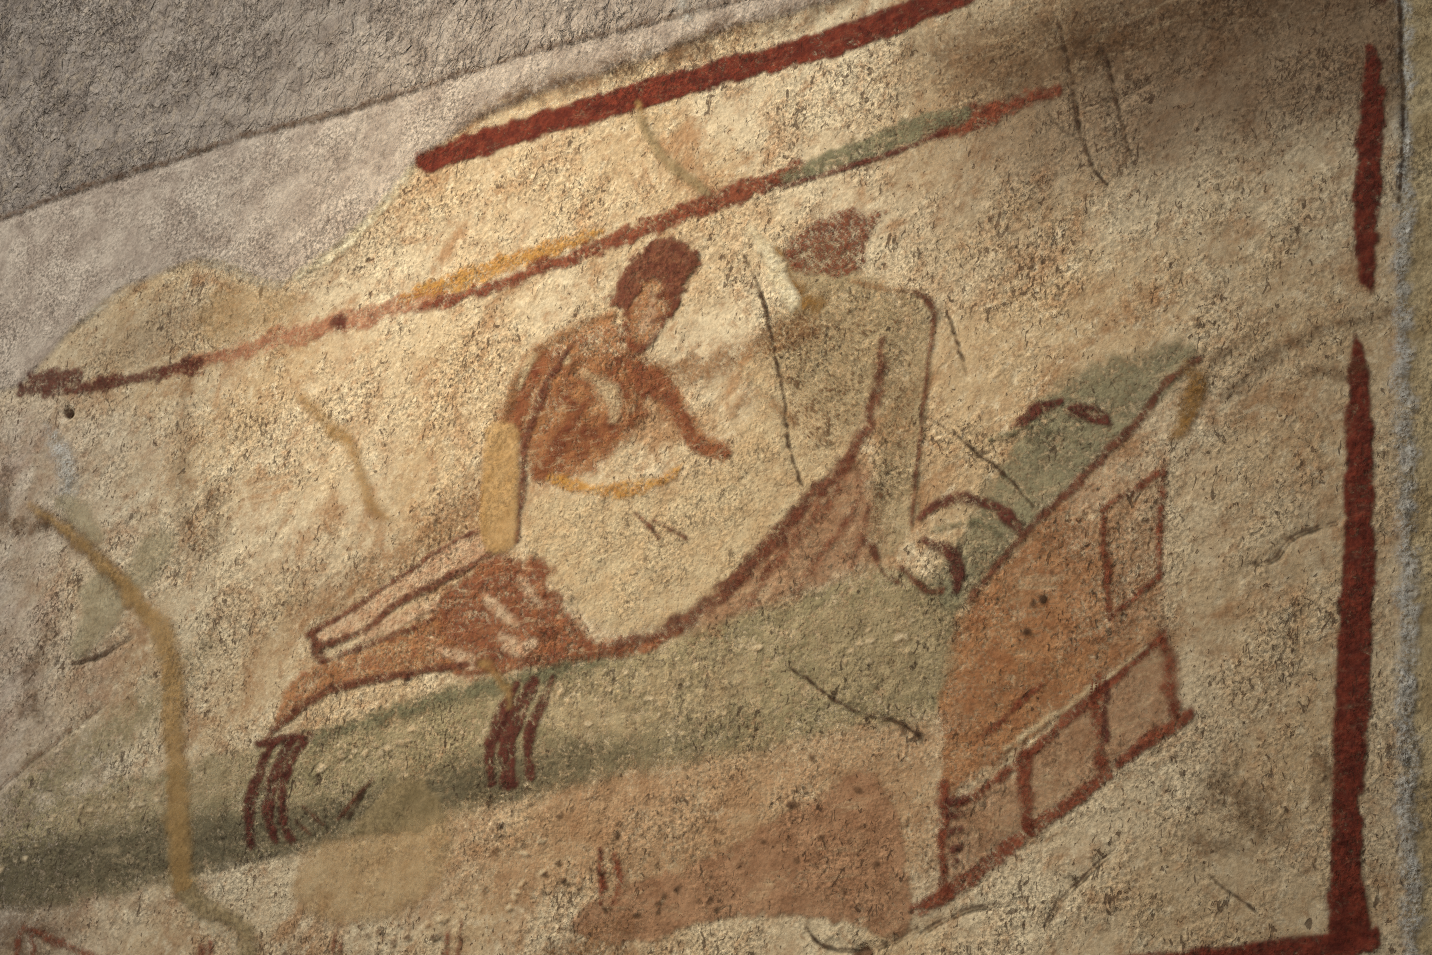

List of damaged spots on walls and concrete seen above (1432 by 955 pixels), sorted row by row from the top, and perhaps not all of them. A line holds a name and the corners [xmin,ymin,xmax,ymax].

crack [742,227,817,485]
crack [957,435,1033,506]
crack [790,667,913,732]